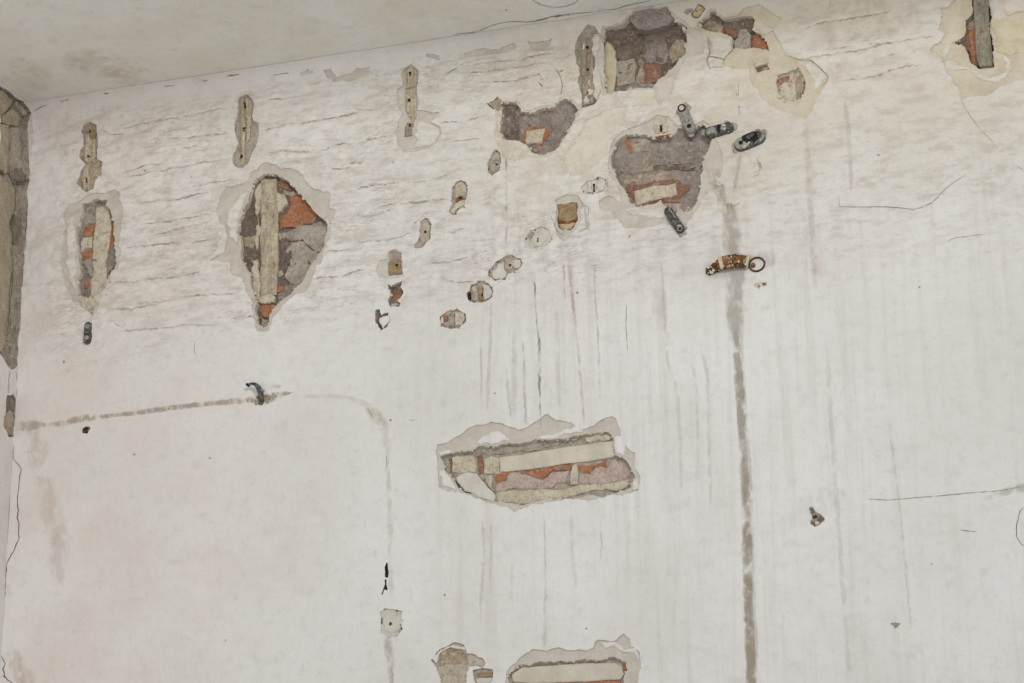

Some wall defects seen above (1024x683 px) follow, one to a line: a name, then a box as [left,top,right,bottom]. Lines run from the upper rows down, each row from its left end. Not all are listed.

spalling [930,0,1024,100]
spalling [488,4,829,229]
crack [871,177,962,210]
spalling [60,190,123,315]
spalling [211,162,336,332]
corrosion [706,254,747,275]
leakage [122,399,240,416]
spalling [436,414,641,512]
leakage [728,270,753,639]
peeling [431,642,492,683]
spalling [505,634,641,683]